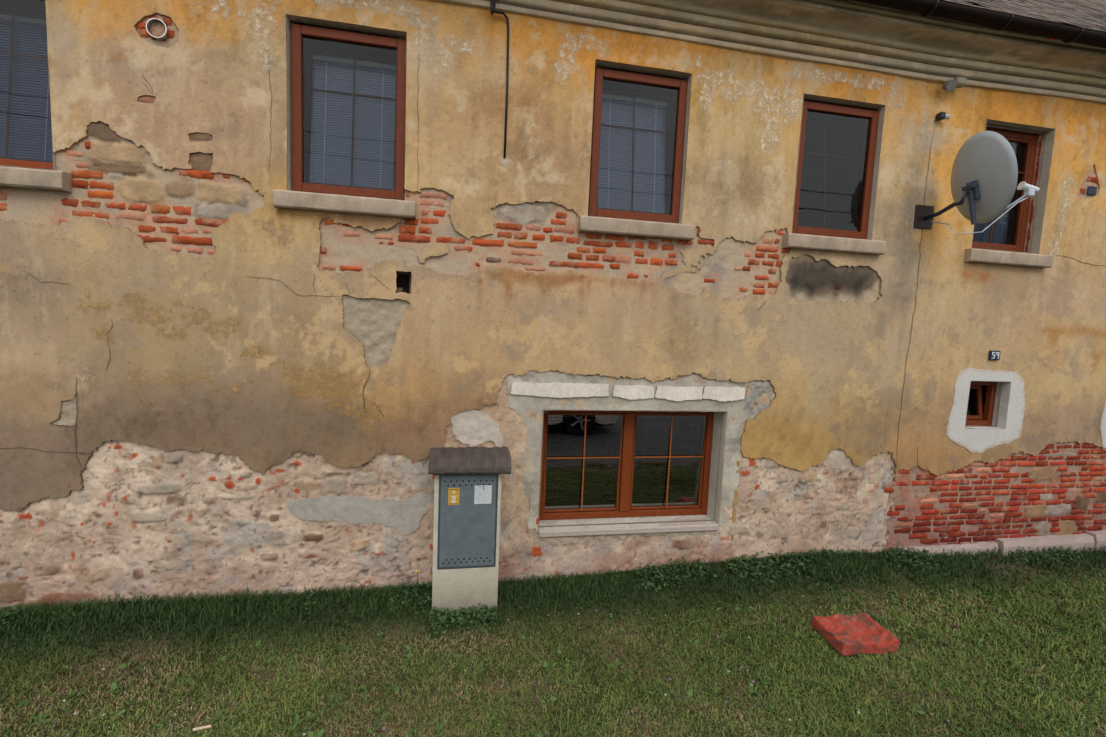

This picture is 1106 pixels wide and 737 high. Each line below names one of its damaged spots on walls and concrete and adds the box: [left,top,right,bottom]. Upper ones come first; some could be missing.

flaking render [0,122,265,258]
flaking render [342,295,411,368]
flaking render [318,188,881,303]
leakage [789,262,873,291]
crack [0,380,93,468]
flaking render [52,394,80,426]
flaking render [0,440,444,612]
flaking render [442,372,1106,581]